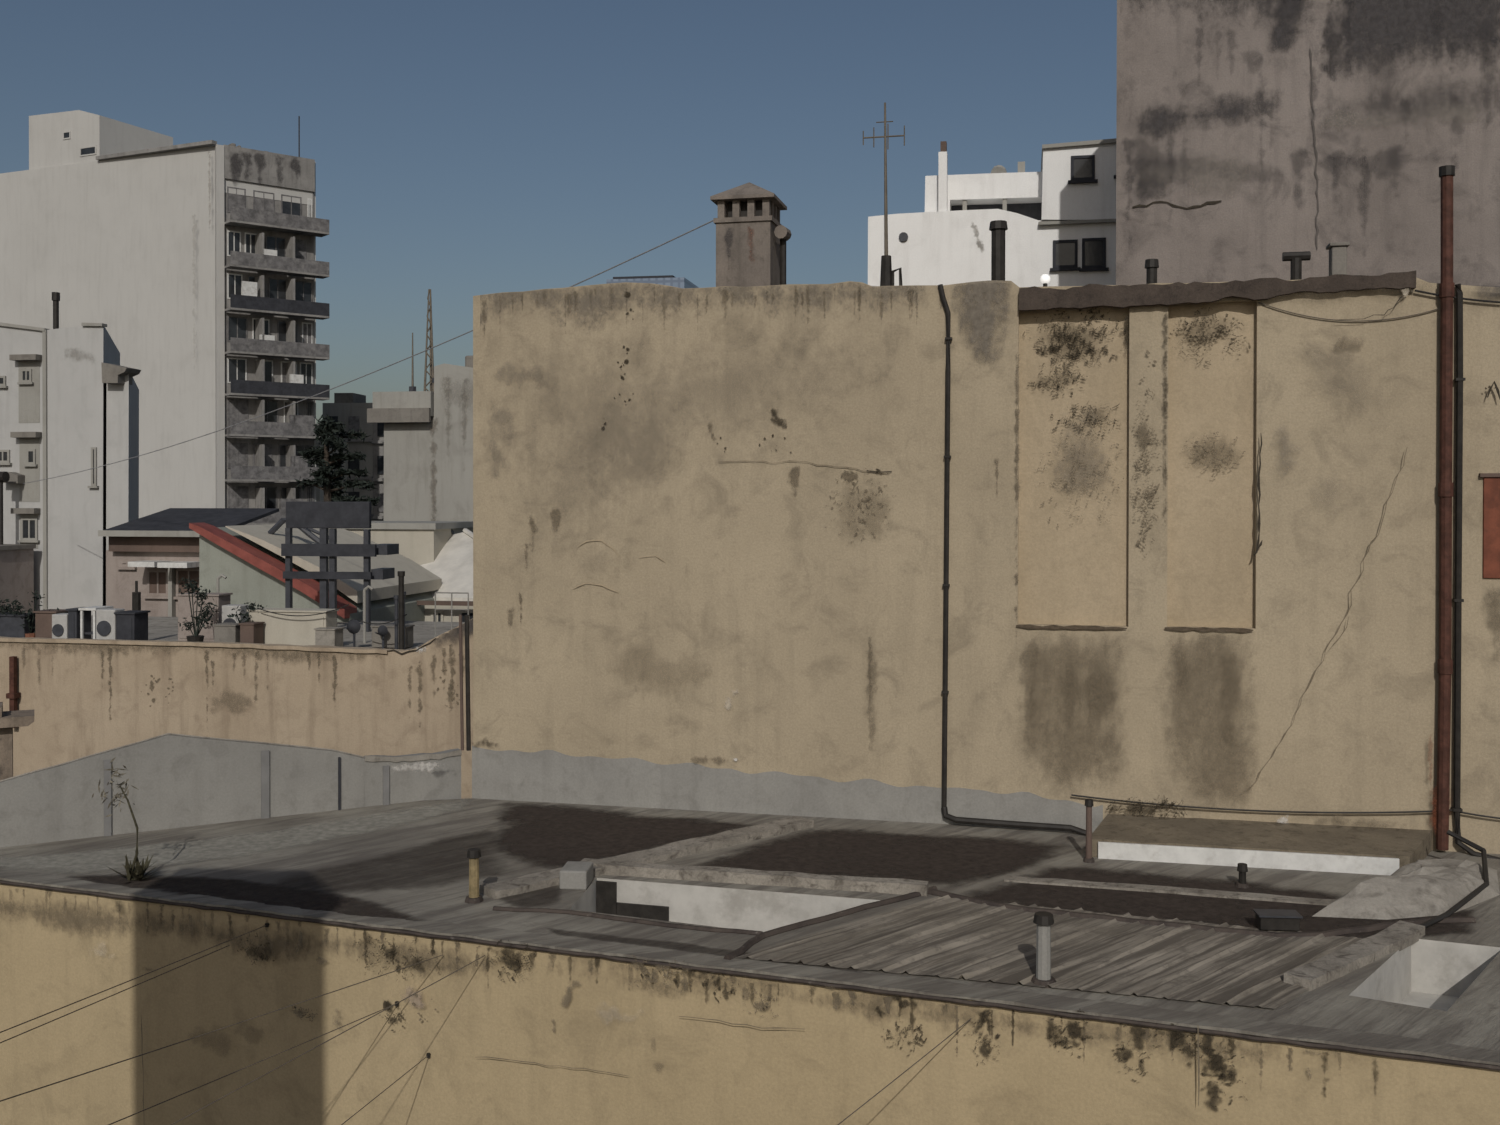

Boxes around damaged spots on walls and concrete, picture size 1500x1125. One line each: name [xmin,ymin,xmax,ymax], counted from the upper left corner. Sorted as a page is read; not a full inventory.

leakage [1324,0,1500,76]
leakage [1141,96,1272,136]
leakage [954,280,1008,359]
leakage [995,307,1251,557]
crack [1243,436,1407,792]
leakage [409,618,473,712]
leakage [356,931,535,982]
leakage [629,955,778,1019]
leakage [876,995,927,1056]
leakage [955,1006,1014,1066]
leakage [1043,1009,1093,1058]
leakage [1112,1023,1247,1111]